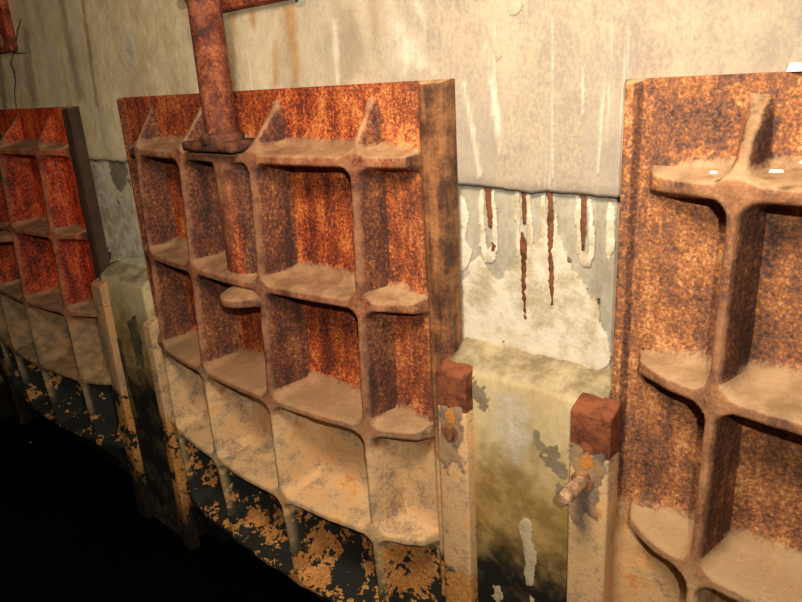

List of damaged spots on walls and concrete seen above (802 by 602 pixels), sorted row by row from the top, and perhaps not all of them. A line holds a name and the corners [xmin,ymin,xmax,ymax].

crack [10,19,26,109]
rust [485,187,493,228]
rust [546,191,554,306]
water stain [472,377,489,412]
water stain [500,397,568,494]
water stain [519,518,537,586]